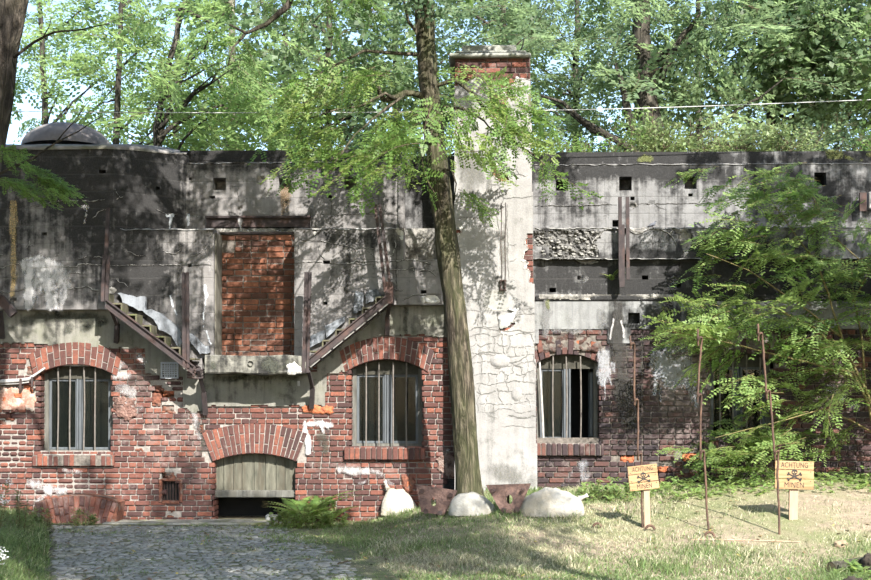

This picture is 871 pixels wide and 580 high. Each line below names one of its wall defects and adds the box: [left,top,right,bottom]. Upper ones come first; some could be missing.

flaking render [455,58,534,119]
crack [30,189,123,218]
corrosion [280,187,289,211]
crack [0,241,209,291]
spalling [521,229,603,284]
leakage [12,255,108,333]
crack [468,299,537,428]
spalling [0,366,44,425]
spalling [113,396,137,421]